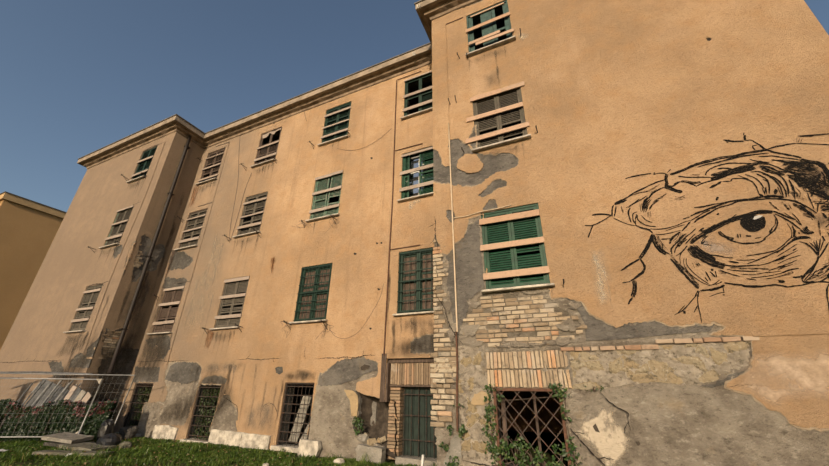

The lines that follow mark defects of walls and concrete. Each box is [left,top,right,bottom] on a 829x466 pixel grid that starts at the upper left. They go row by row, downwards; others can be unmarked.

peeling [433,125,519,218]
peeling [113,234,193,291]
flaking render [463,288,587,347]
peeling [133,335,238,438]
spalling [355,392,397,459]